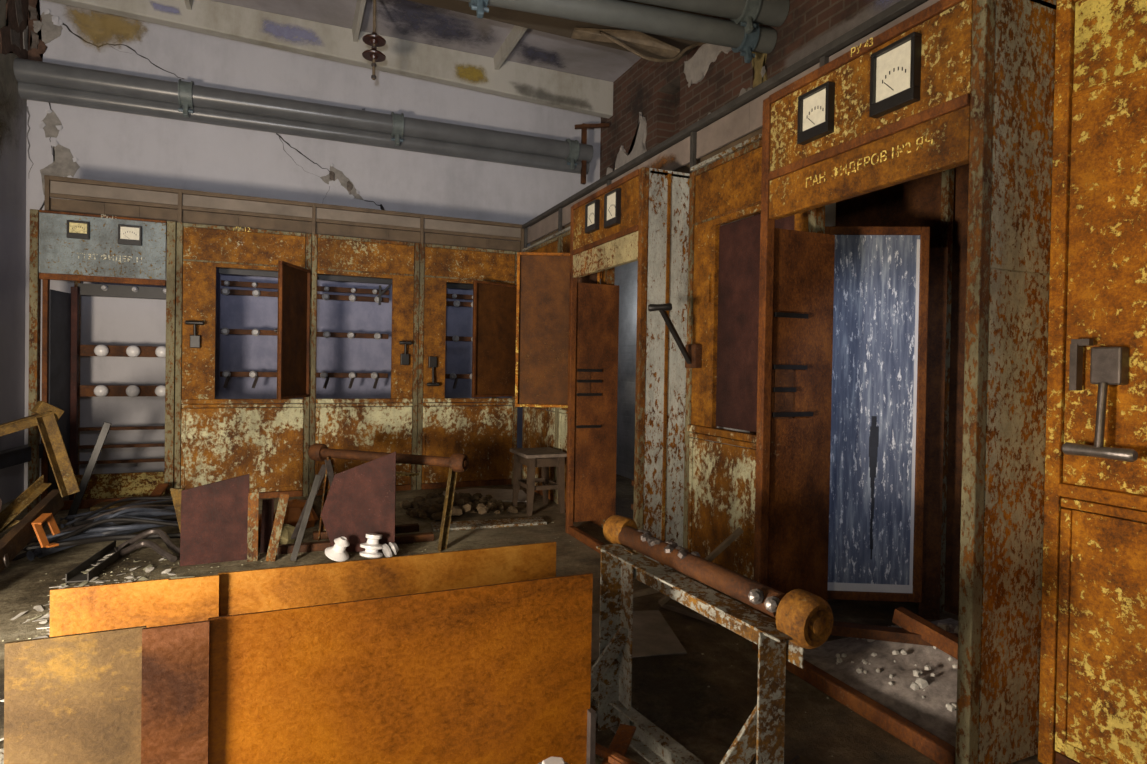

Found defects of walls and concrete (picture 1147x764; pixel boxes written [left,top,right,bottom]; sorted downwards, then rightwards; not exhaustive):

spalling [0,0,63,62]
leakage [68,9,142,45]
crack [63,23,184,79]
peeling [683,43,732,87]
peeling [738,51,768,97]
peeling [38,109,80,195]
crack [276,133,330,204]
spalling [320,163,363,200]
peeling [606,112,647,175]